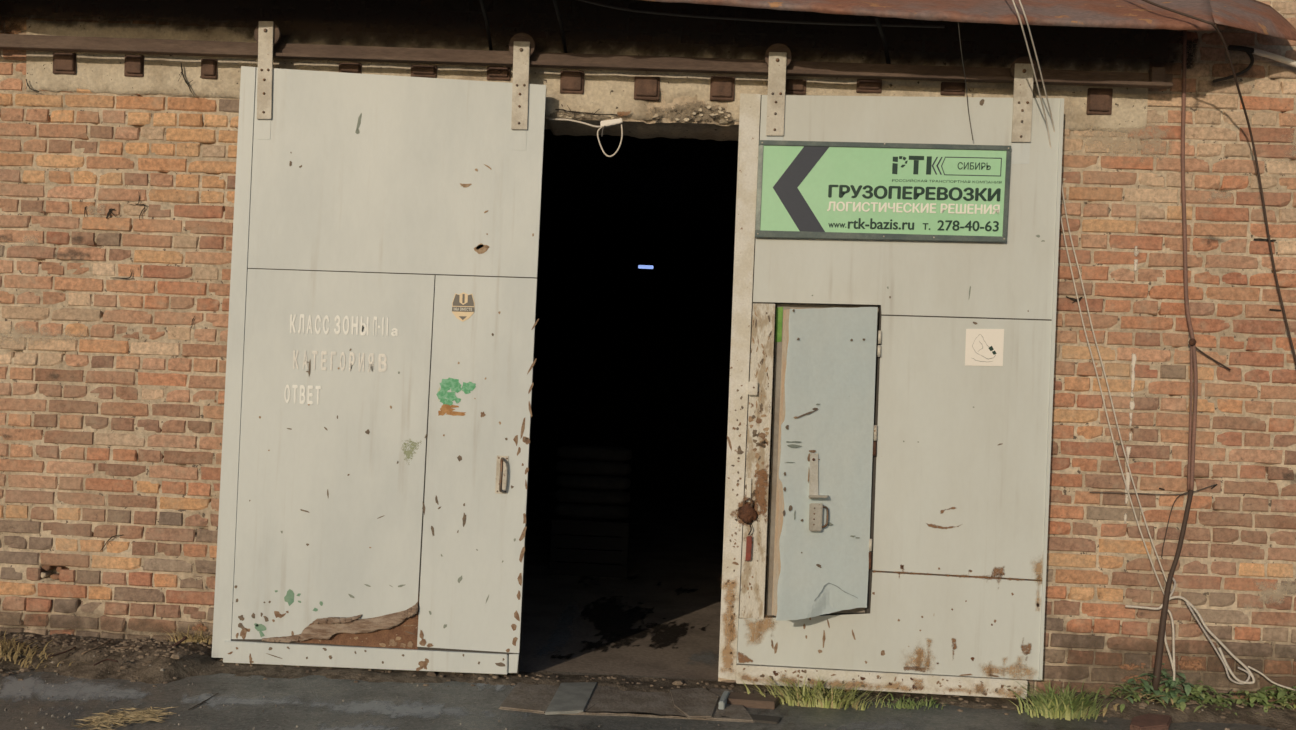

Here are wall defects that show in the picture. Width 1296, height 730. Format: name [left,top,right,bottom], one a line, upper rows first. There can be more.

corrosion [731,465,768,525]
peeling [228,585,434,671]
damp [551,596,707,659]
corrosion [723,581,1031,698]